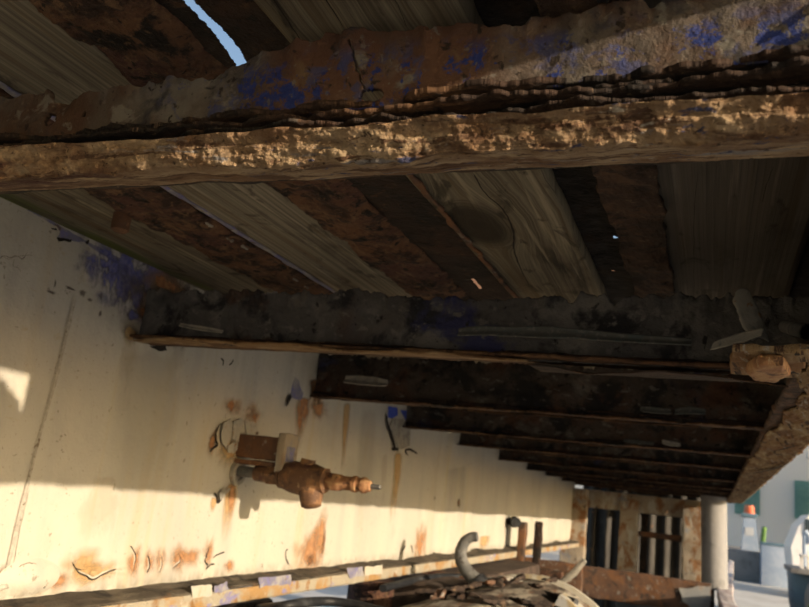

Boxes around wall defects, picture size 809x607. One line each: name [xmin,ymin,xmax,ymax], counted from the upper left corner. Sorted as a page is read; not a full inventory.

peeling [28,210,166,320]
crack [5,246,90,568]
peeling [386,406,417,455]
rust [211,484,236,516]
rust [302,519,325,565]